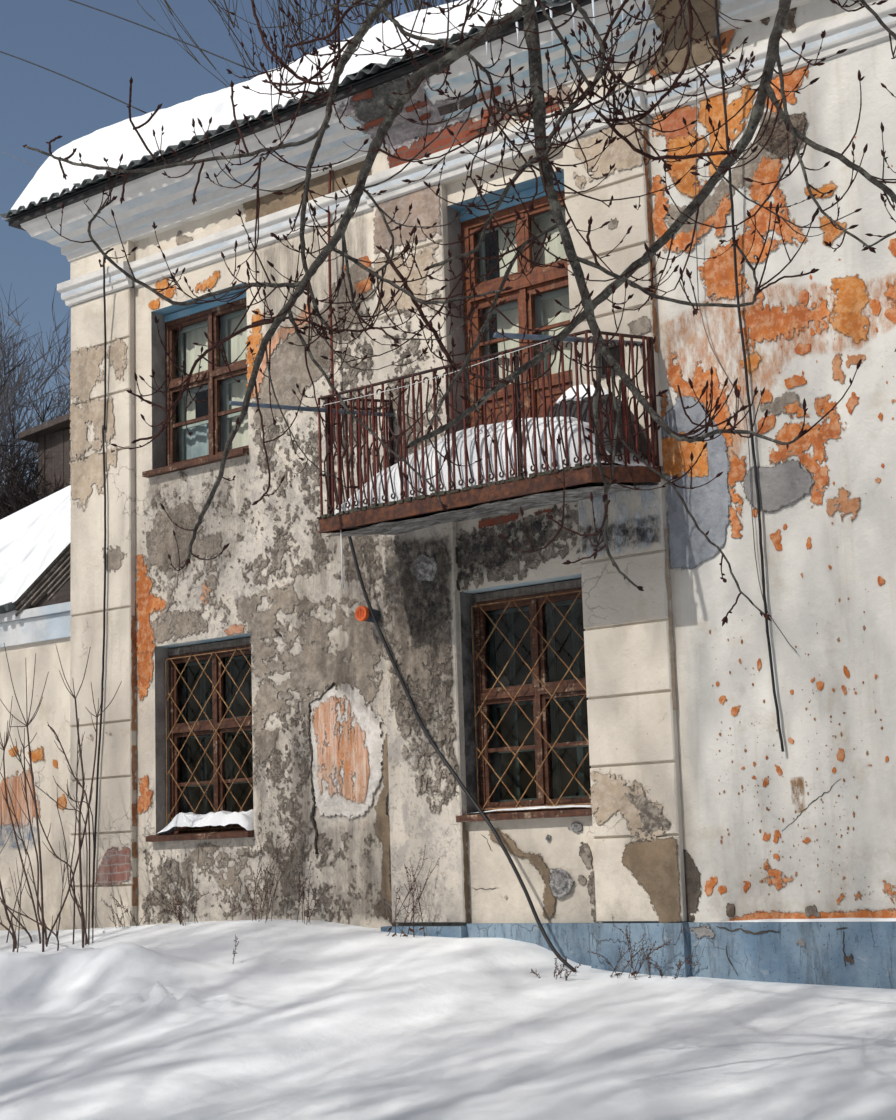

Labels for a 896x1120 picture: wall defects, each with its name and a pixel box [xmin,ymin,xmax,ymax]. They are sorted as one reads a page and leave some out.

flaking render [350,72,573,168]
peeling [573,66,896,539]
peeling [69,337,128,511]
peeling [770,524,787,551]
spalling [135,460,459,808]
peeling [137,775,154,814]
spalling [589,658,896,939]
crack [782,779,840,831]
spalling [462,822,470,923]